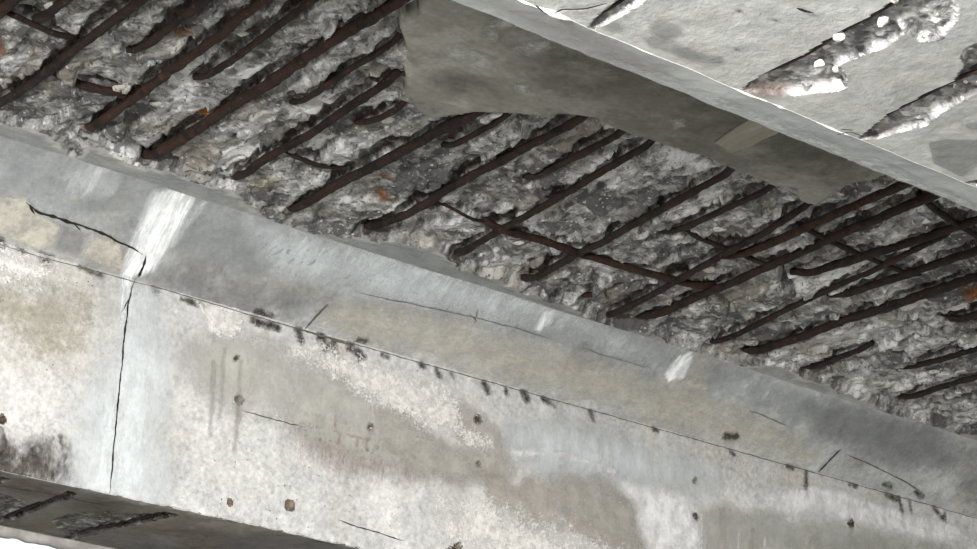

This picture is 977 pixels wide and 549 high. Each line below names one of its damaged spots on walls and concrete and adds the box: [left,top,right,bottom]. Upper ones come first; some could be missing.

spalling [0,477,77,522]
spalling [50,510,178,541]
damp [0,174,532,501]
crack [340,520,403,541]
spalling [0,0,977,435]
crack [0,202,977,519]